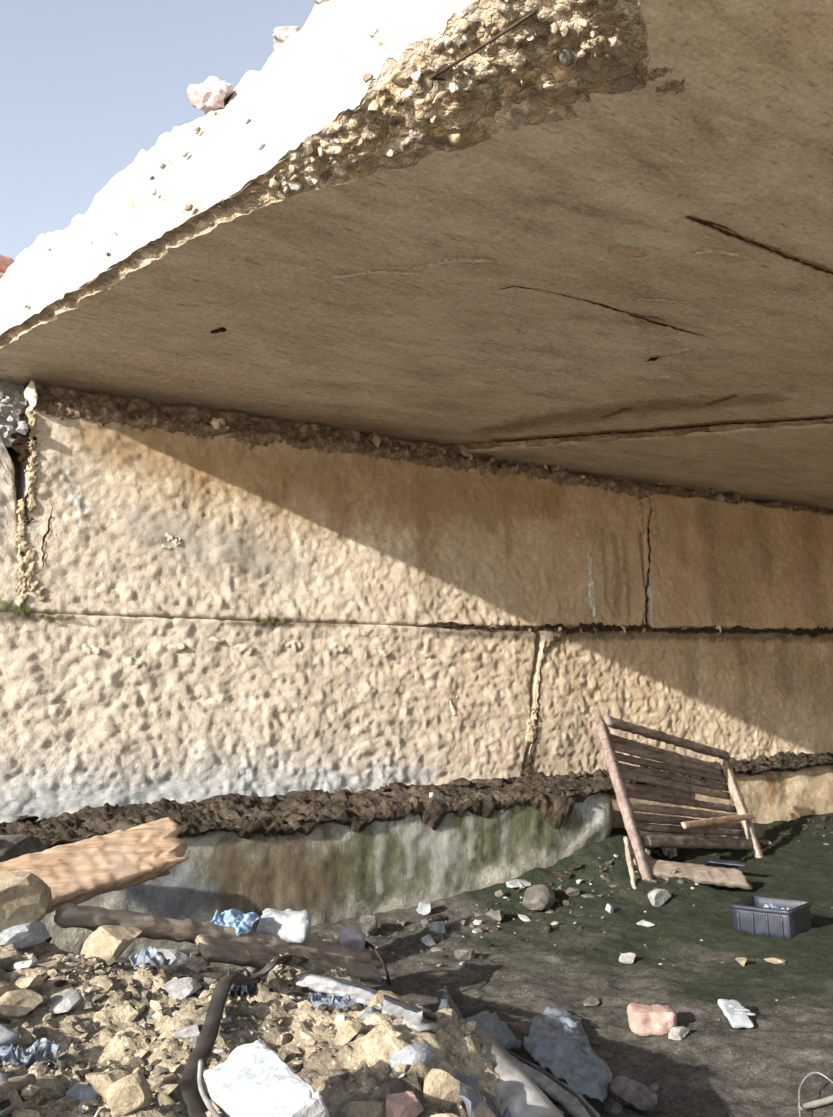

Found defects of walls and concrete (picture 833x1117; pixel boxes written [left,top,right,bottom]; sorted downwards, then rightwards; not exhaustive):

spalling [0,0,685,348]
crack [686,216,833,275]
crack [492,286,712,339]
crack [15,410,53,607]
leakage [62,469,91,531]
leakage [588,555,597,617]
crack [634,491,660,625]
crack [520,635,560,775]
leakage [119,831,363,918]
leakage [397,815,460,873]
leakage [474,798,482,861]